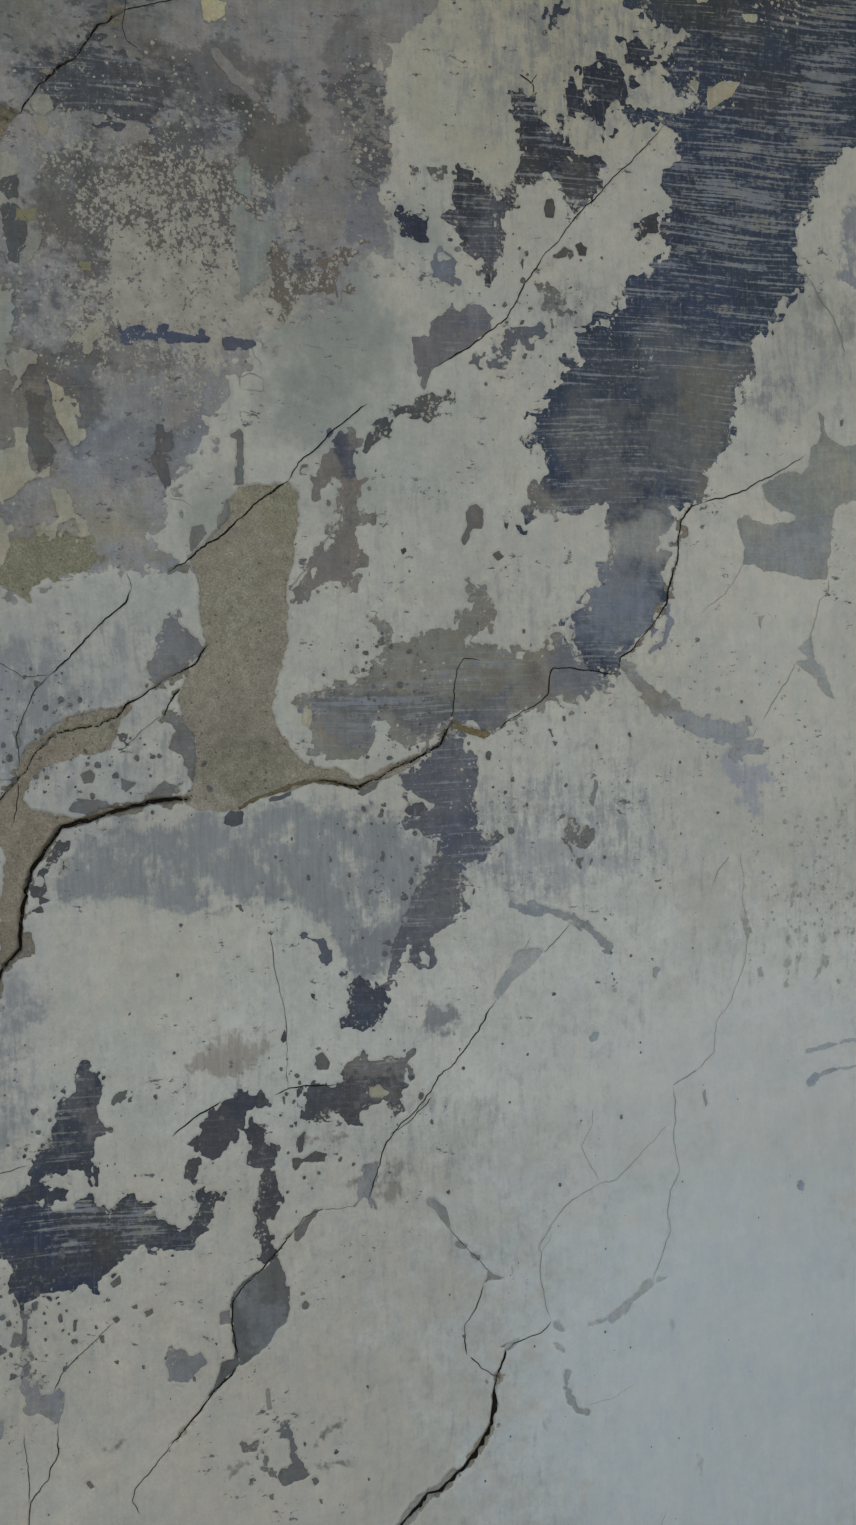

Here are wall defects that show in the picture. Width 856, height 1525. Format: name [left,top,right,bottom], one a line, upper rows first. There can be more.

crack [18,0,170,115]
crack [429,122,668,369]
crack [0,339,367,824]
crack [311,658,477,791]
peeling [0,0,856,1032]
crack [494,454,806,733]
crack [753,580,829,736]
crack [0,785,187,1012]
crack [271,942,337,1095]
peeling [0,1048,416,1425]
crack [132,1001,496,1514]
crack [400,856,750,1525]